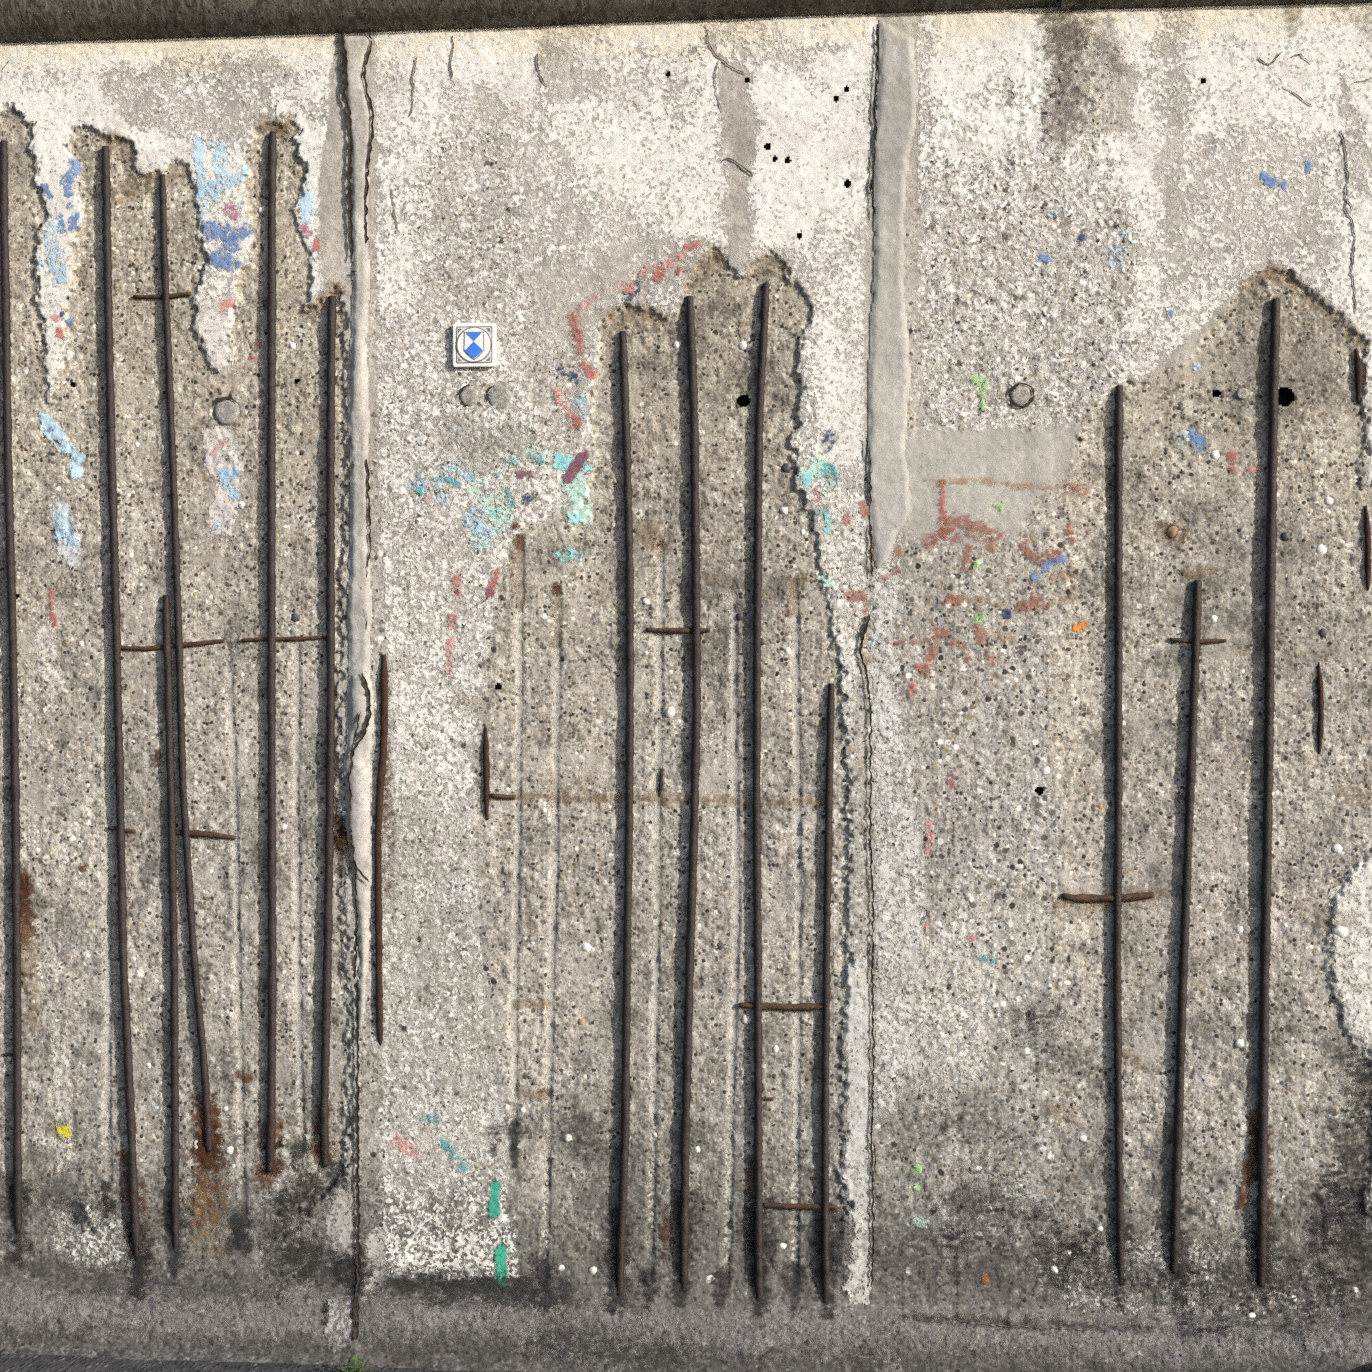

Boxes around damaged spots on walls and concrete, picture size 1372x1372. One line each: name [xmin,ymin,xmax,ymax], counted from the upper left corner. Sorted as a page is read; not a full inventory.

crack [360,459,371,629]
rust [513,522,525,550]
spalling [0,14,1004,1349]
spalling [914,2,1372,1322]
rust [11,872,38,945]
rust [334,815,349,851]
crack [346,673,372,1340]
crack [859,615,877,1286]
rust [187,1093,231,1230]
rust [254,1114,288,1189]
water stain [0,1039,1372,1372]
rust [1234,1104,1276,1266]